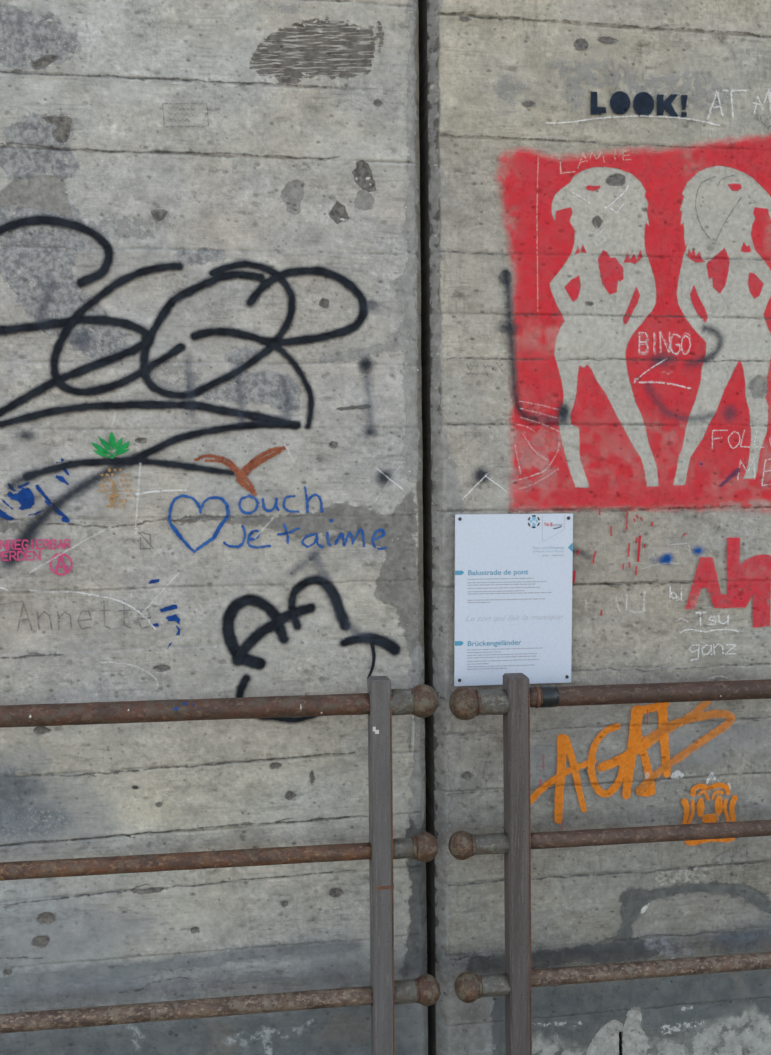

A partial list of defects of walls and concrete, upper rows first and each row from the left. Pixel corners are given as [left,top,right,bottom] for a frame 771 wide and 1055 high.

damp [0,767,68,837]
damp [456,996,506,1053]
damp [532,972,771,1055]